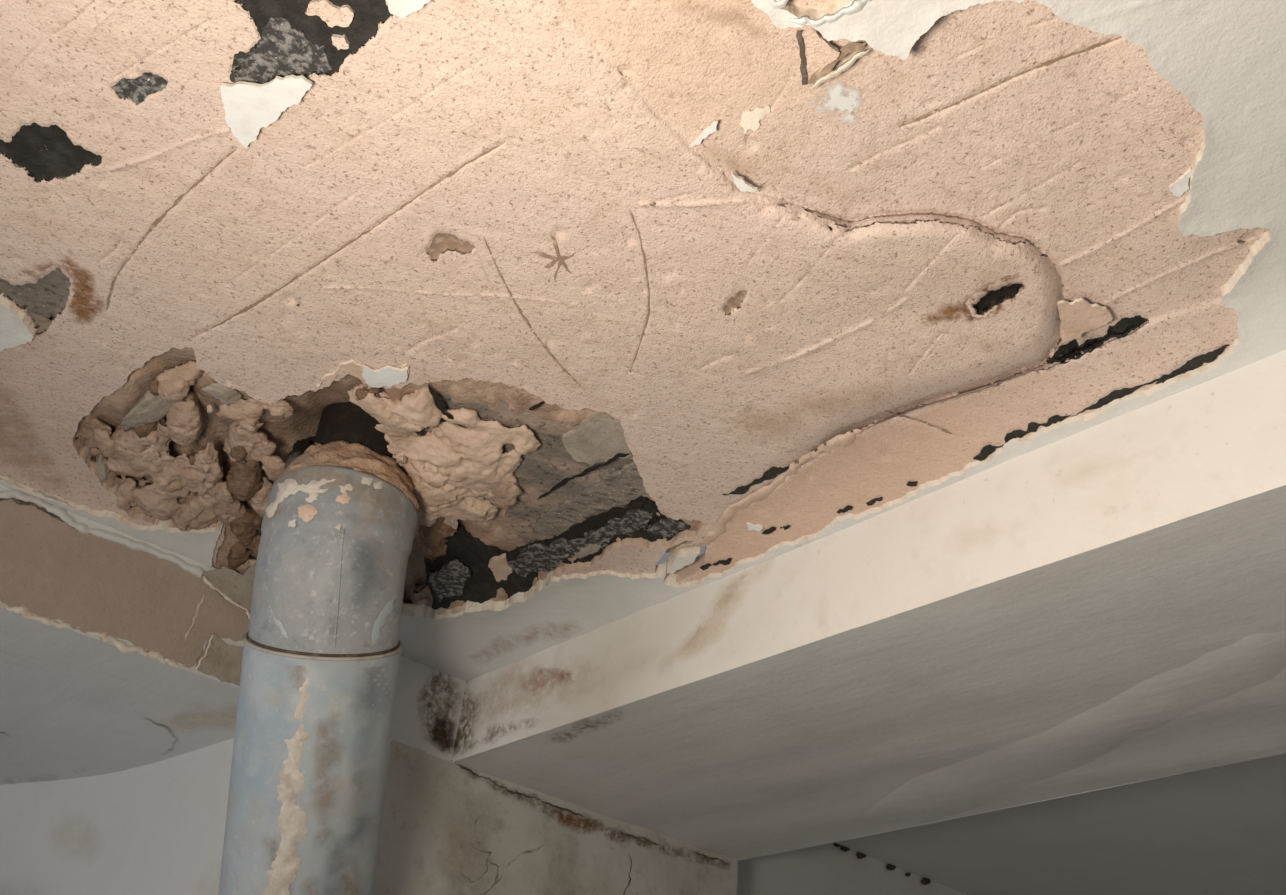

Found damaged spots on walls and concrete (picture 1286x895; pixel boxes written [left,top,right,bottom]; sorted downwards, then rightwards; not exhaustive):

spalling [0,0,1268,671]
water stain [432,719,457,750]